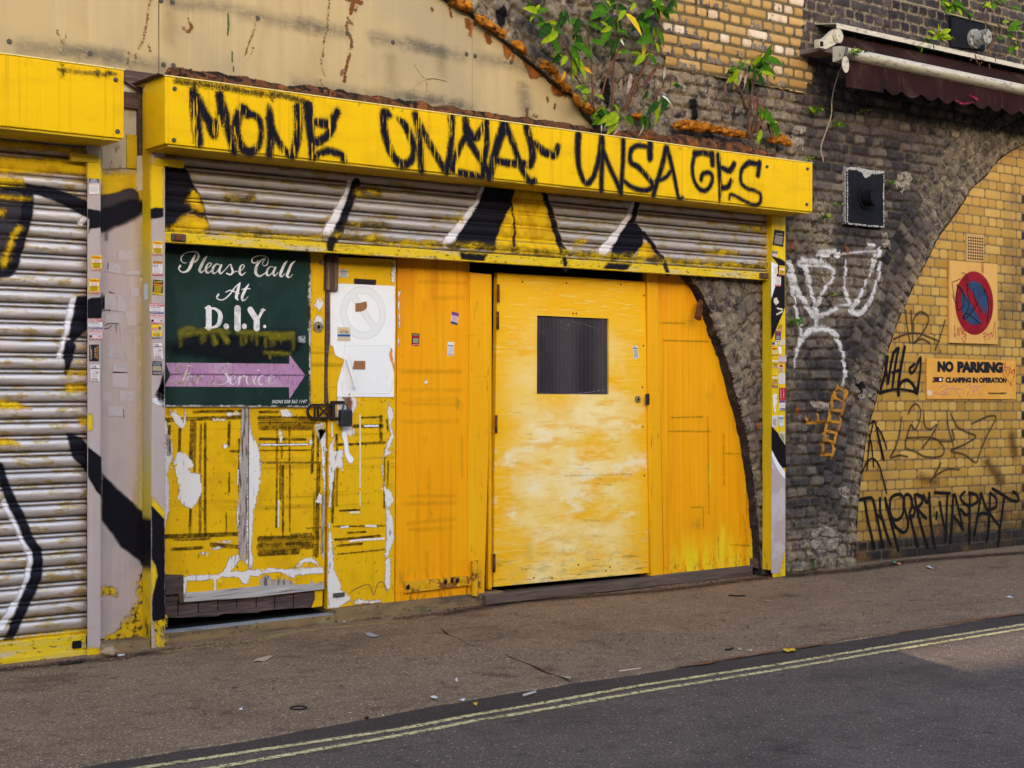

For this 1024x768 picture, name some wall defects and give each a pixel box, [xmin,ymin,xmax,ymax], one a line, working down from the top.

rust [340,0,363,83]
peeling [165,408,202,526]
peeling [183,393,396,608]
crack [504,654,573,682]